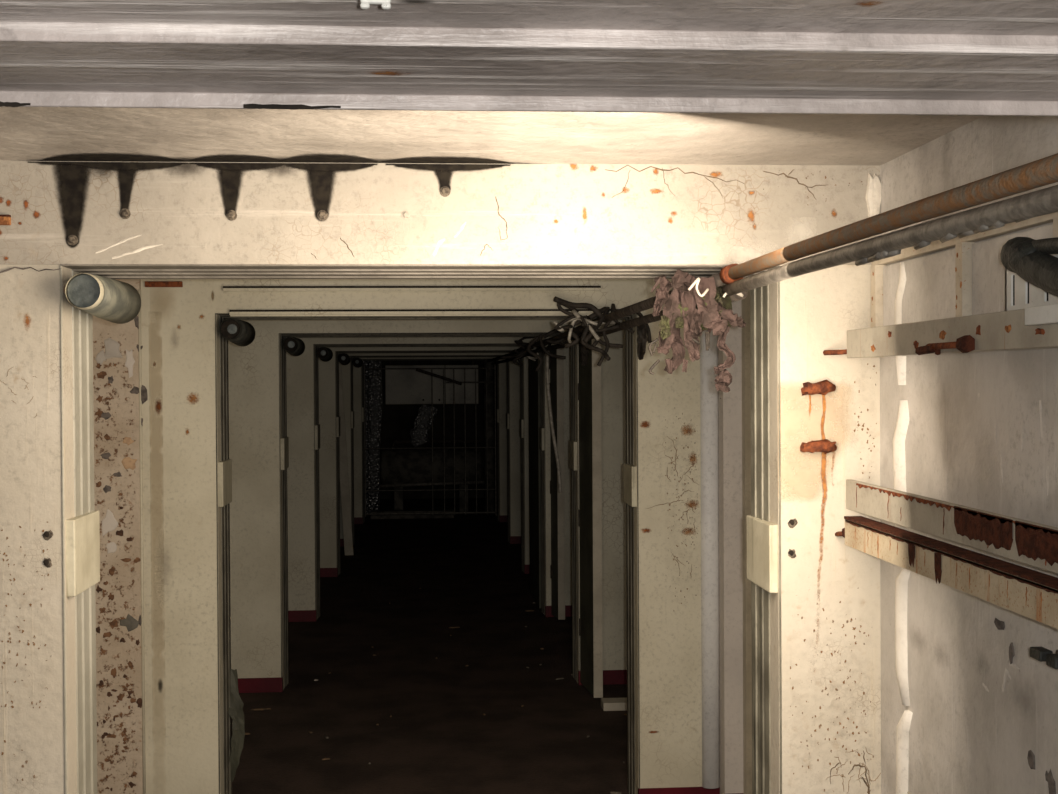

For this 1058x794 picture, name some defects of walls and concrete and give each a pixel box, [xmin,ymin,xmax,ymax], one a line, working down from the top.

crack [605,165,825,199]
crack [0,266,61,274]
rust [801,382,836,576]
peeling [93,338,148,794]
rust [845,521,1058,610]
rust [856,483,1058,566]
crack [827,749,881,794]